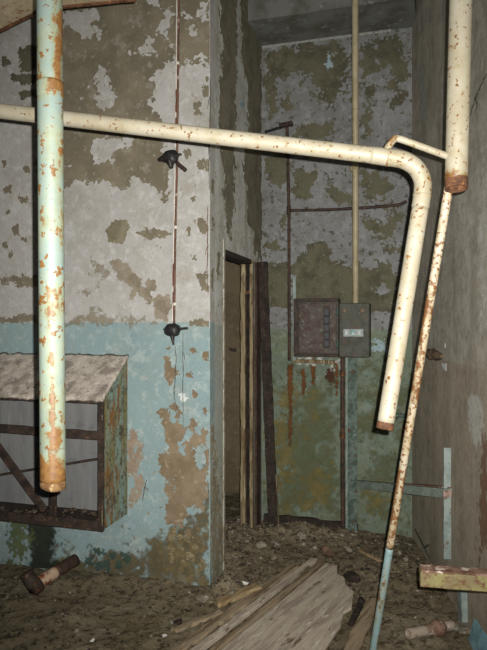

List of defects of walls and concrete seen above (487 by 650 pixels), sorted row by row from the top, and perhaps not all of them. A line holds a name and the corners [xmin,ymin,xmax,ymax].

peeling [1,45,37,100]
peeling [63,0,210,122]
peeling [218,0,411,140]
peeling [63,126,172,204]
peeling [105,219,172,244]
peeling [211,146,406,314]
peeling [0,273,38,289]
peeling [109,258,172,322]
peeling [195,251,221,292]
rust [287,357,316,447]
rust [325,361,339,396]
peeling [156,402,223,583]